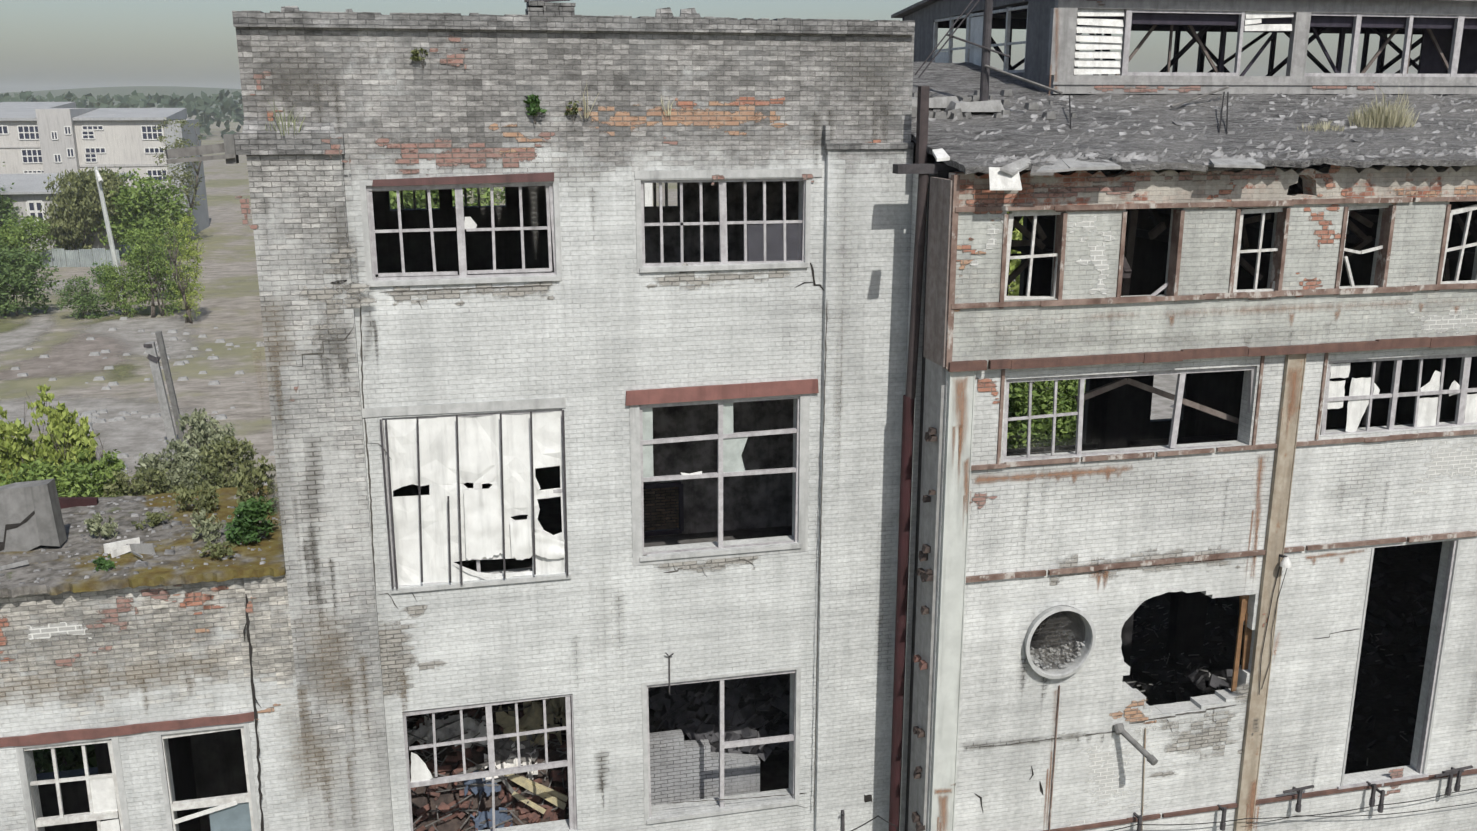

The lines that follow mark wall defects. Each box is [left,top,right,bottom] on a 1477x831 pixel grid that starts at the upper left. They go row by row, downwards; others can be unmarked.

damp [261,51,340,128]
spalling [566,97,789,145]
spalling [1304,165,1349,247]
damp [319,328,349,384]
corrosion [953,379,1127,498]
damp [277,442,366,715]
crack [663,263,828,811]
corrosion [1249,458,1262,547]
spalling [0,584,228,666]
crack [243,594,264,831]
damp [293,689,352,814]
corrosion [1246,782,1259,828]